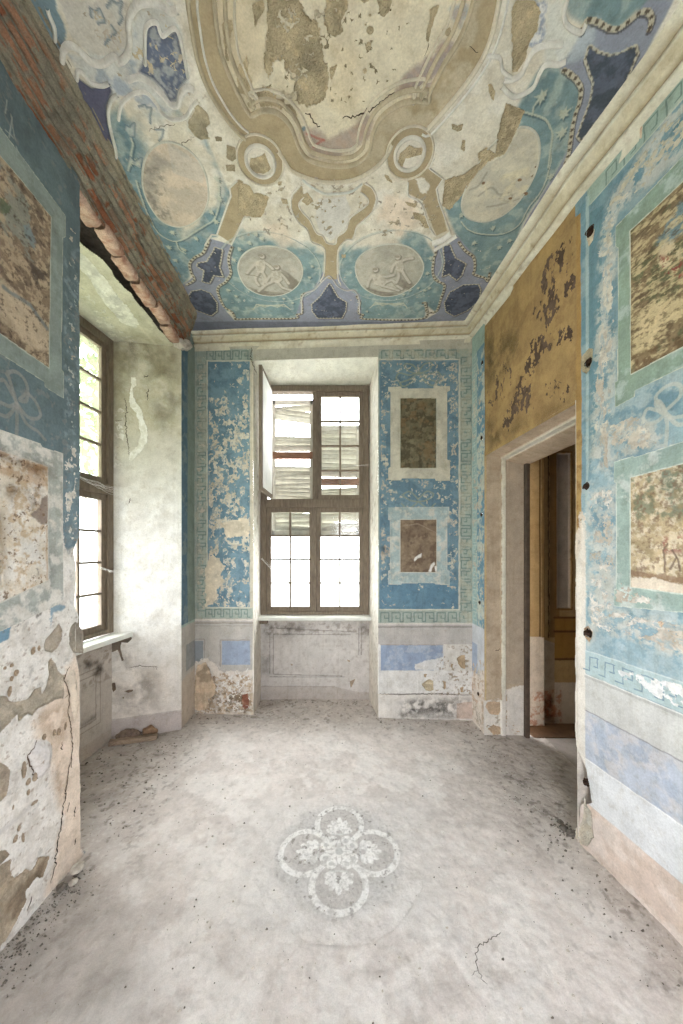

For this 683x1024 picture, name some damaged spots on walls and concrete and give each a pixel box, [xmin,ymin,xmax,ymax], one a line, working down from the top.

flaking render [222,0,396,117]
flaking render [175,84,525,236]
crack [343,93,393,119]
peeling [196,357,251,613]
peeling [472,240,576,620]
flaking render [0,622,84,732]
flaking render [195,662,252,713]
peeling [618,670,683,707]
flaking render [0,761,38,810]
crack [51,668,76,880]
flaking render [0,825,49,946]
crack [473,932,501,984]